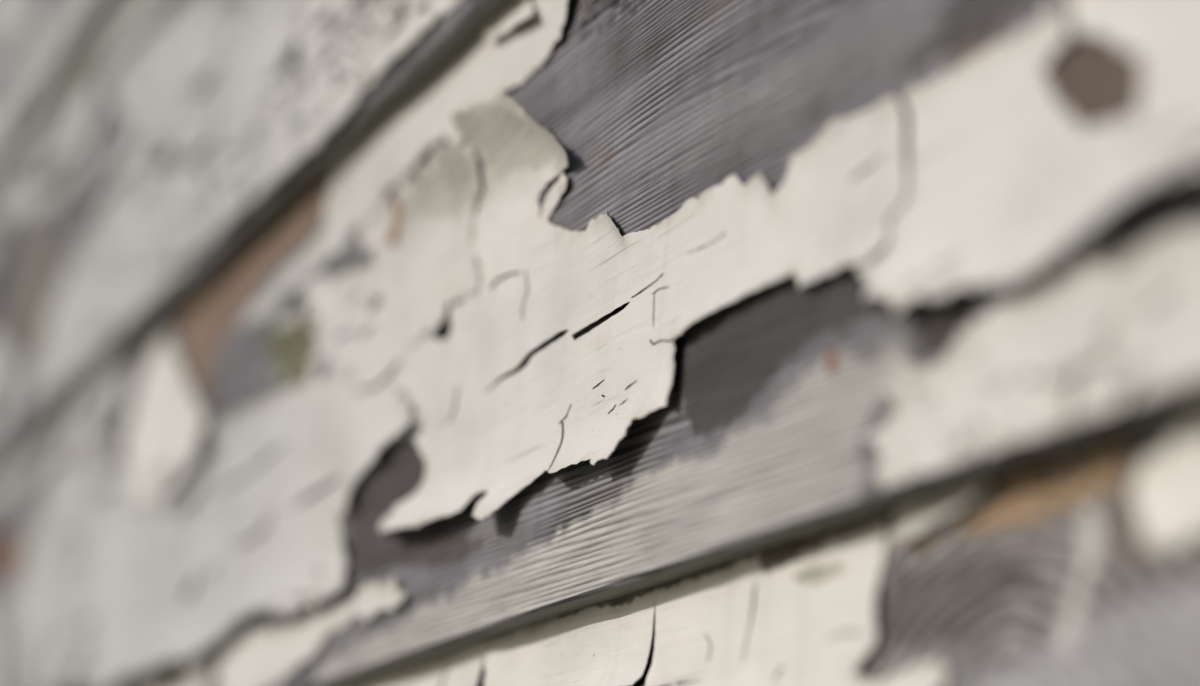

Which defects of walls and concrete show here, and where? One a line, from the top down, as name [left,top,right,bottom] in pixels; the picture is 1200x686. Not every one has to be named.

peeling [0,0,571,686]
peeling [351,474,993,686]
crack [632,634,712,686]
peeling [378,0,1200,554]